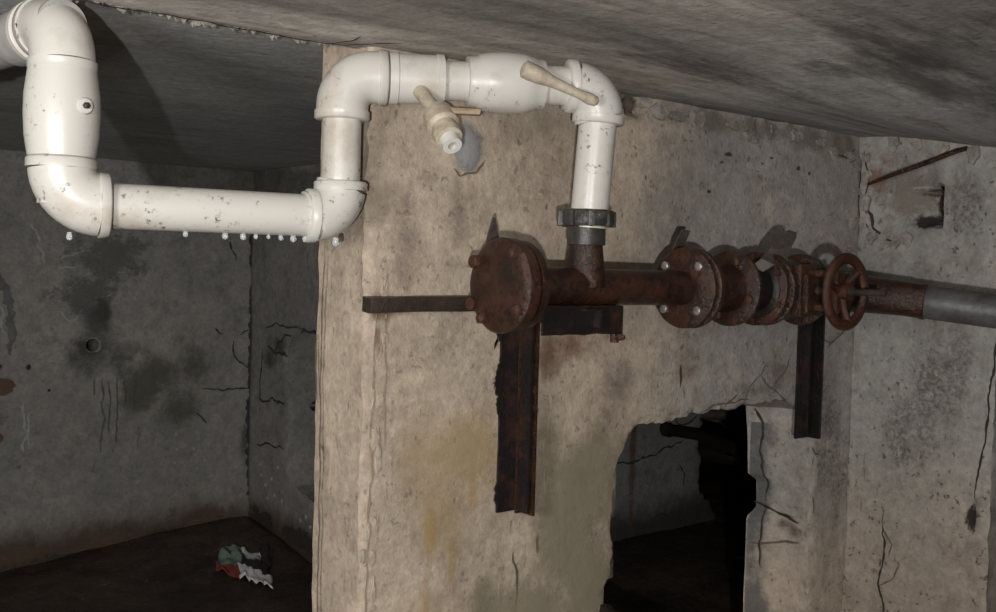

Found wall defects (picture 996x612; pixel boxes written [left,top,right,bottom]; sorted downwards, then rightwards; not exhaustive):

leakage [827,26,984,101]
leakage [62,233,146,334]
leakage [93,360,194,453]
crack [204,234,325,612]
leakage [536,364,612,612]
crack [617,354,814,568]
crack [877,510,900,612]
crack [963,344,996,536]